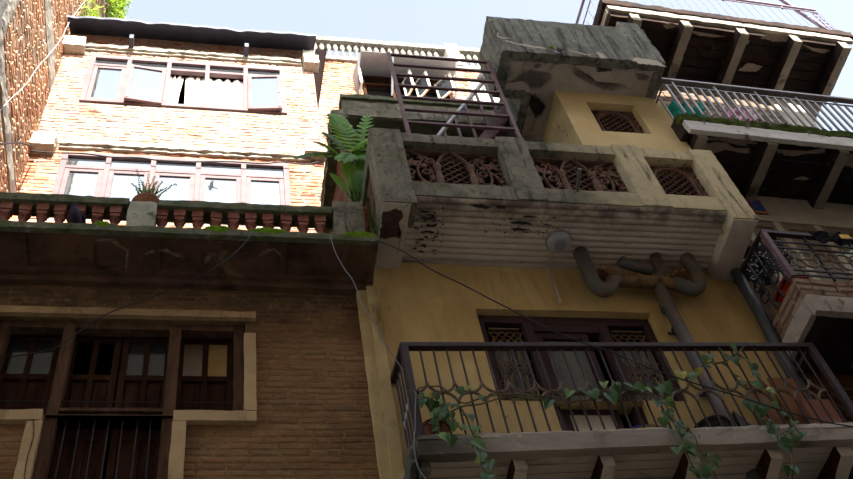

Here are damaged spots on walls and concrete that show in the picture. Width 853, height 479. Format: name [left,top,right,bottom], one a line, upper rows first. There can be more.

spalling [379,208,403,241]
peeling [411,203,445,260]
crack [24,420,34,479]